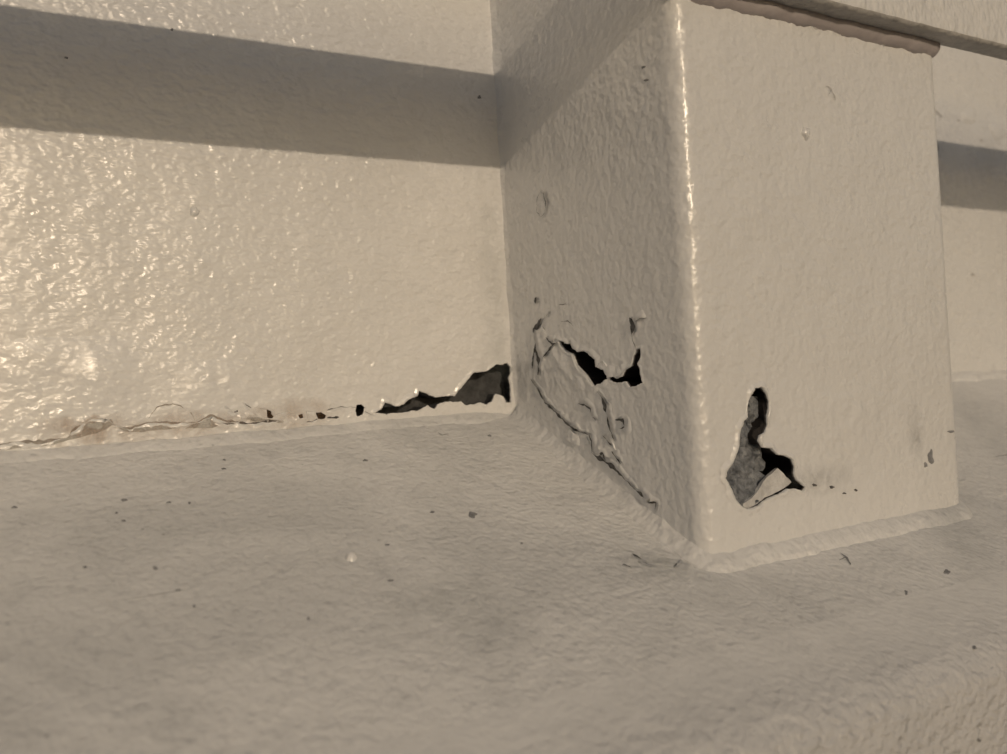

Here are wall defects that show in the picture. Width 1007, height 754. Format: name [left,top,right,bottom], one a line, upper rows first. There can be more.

peeling [0,403,239,451]
spalling [354,360,514,419]
crack [531,297,660,512]
peeling [555,335,644,394]
peeling [720,381,817,516]